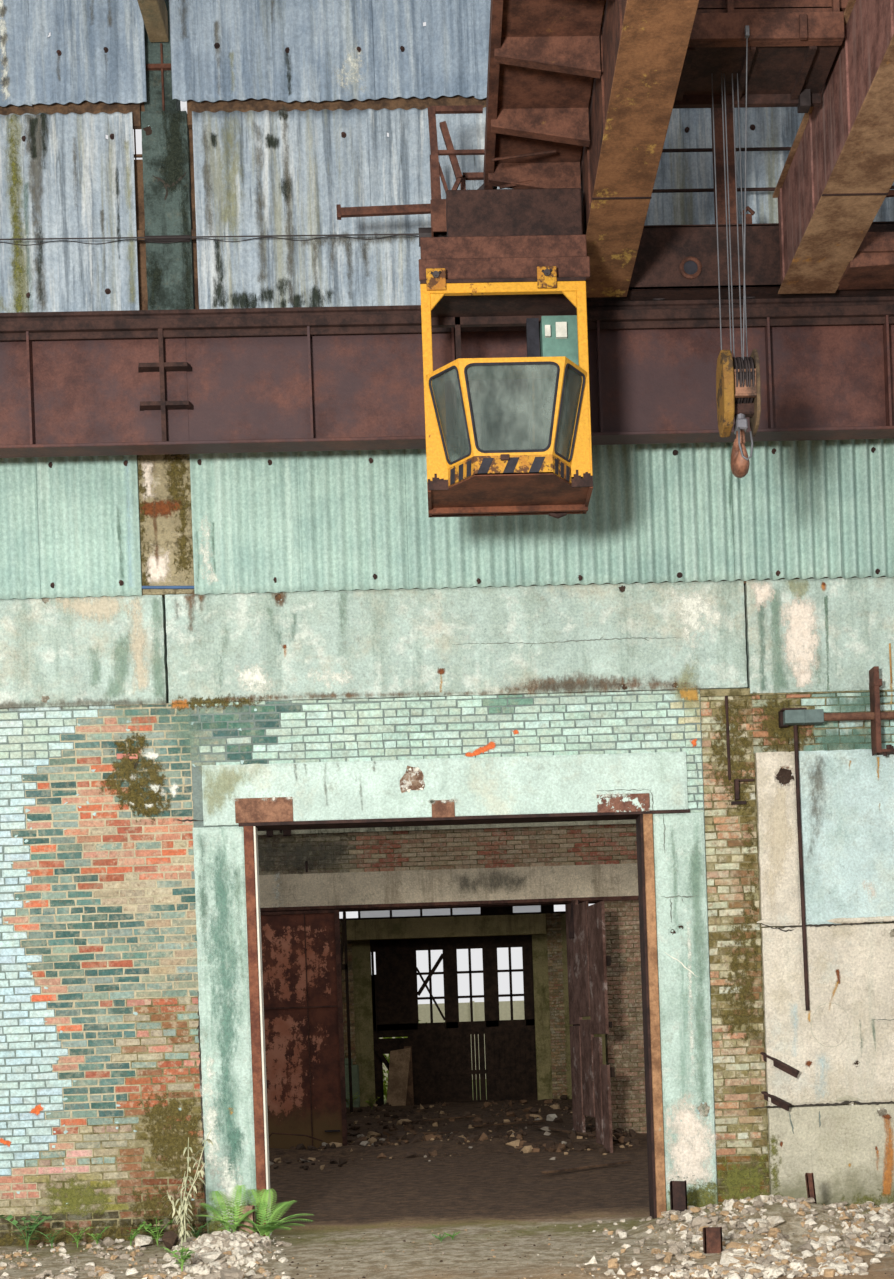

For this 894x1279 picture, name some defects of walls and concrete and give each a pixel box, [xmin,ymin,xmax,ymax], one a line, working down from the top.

leakage [9,113,47,312]
leakage [203,133,217,224]
leakage [257,110,287,163]
leakage [213,161,414,308]
peeling [42,596,147,689]
leakage [508,676,686,694]
peeling [752,583,819,687]
spalling [400,766,457,804]
peeling [0,665,302,1225]
rust [875,1114,894,1195]